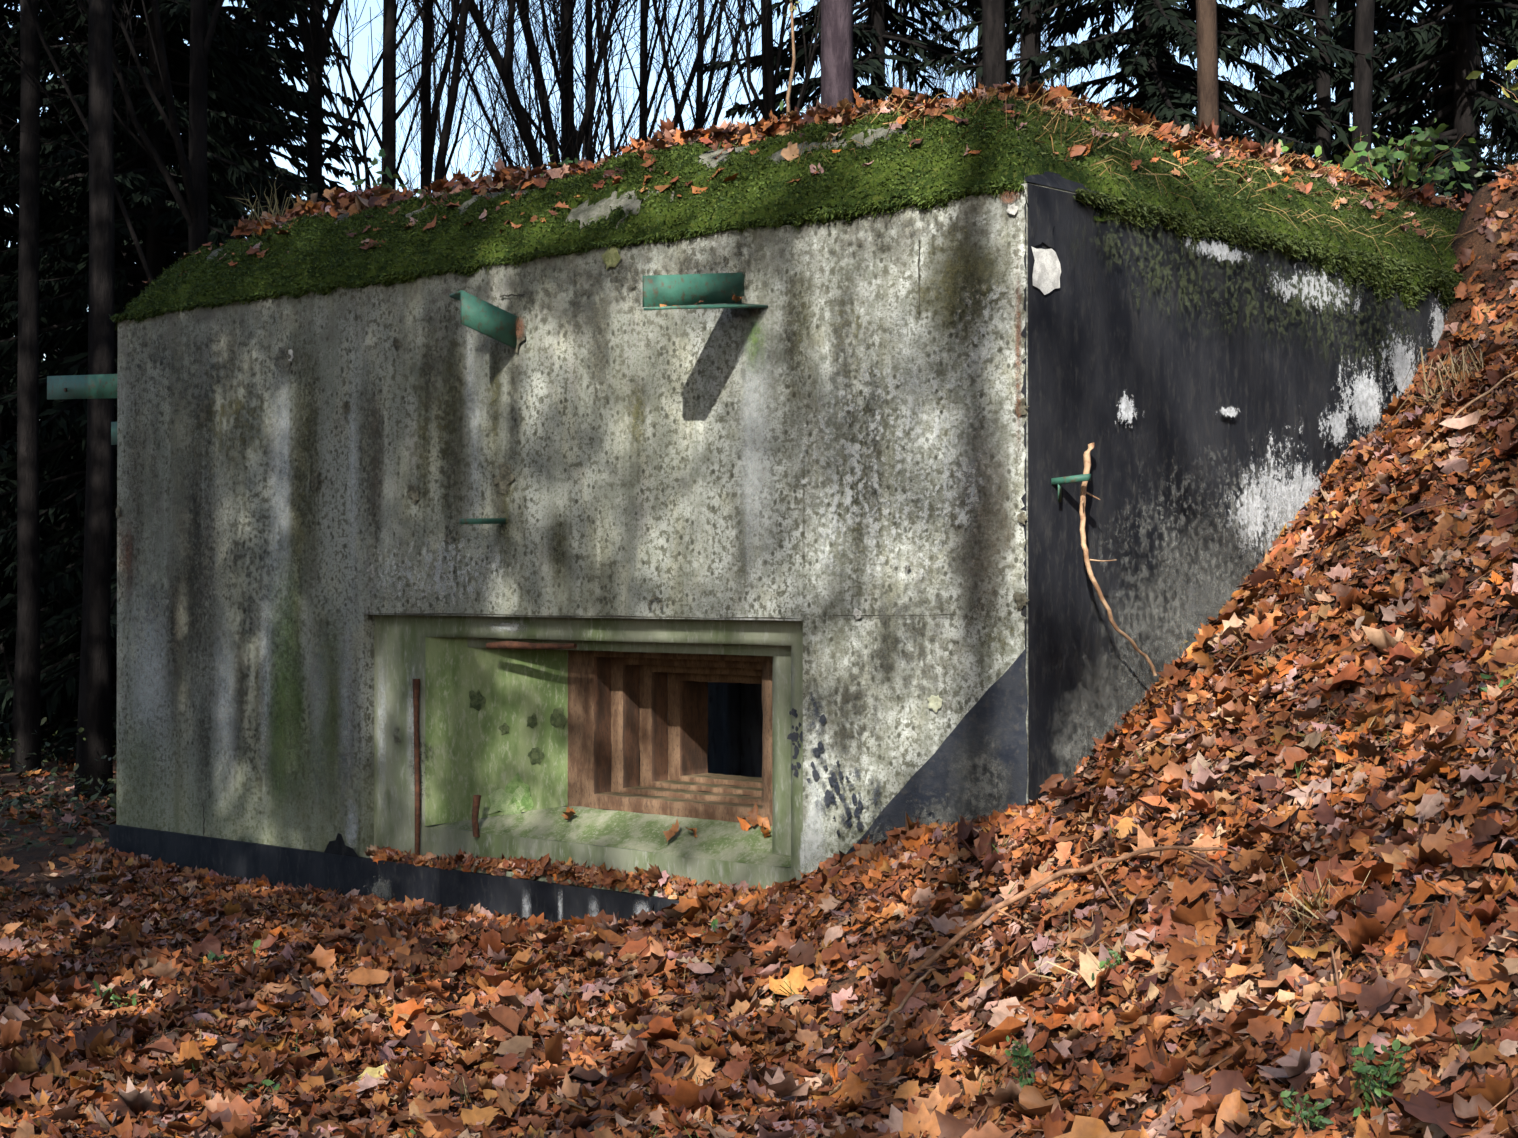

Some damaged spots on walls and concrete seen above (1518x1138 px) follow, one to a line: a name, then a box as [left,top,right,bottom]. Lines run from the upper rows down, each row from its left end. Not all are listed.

leakage [526,246,766,396]
leakage [842,215,1007,357]
leakage [126,328,350,785]
leakage [384,487,513,596]
leakage [417,319,517,508]
leakage [627,389,644,452]
leakage [802,298,1014,647]